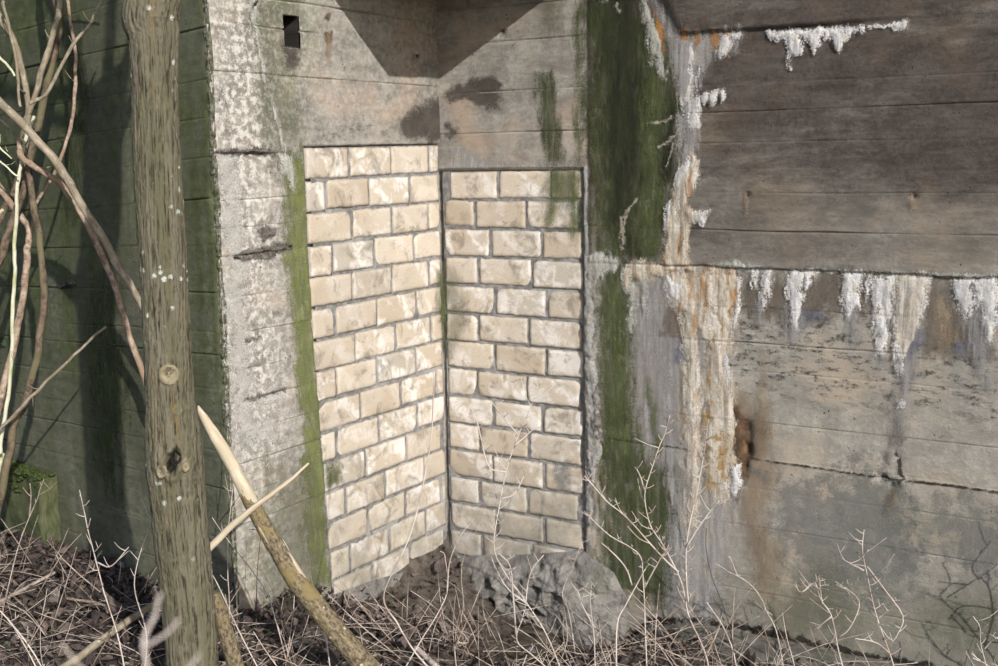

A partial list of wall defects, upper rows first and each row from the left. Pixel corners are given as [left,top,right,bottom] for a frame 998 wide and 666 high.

damp [401,77,580,171]
damp [586,0,998,620]